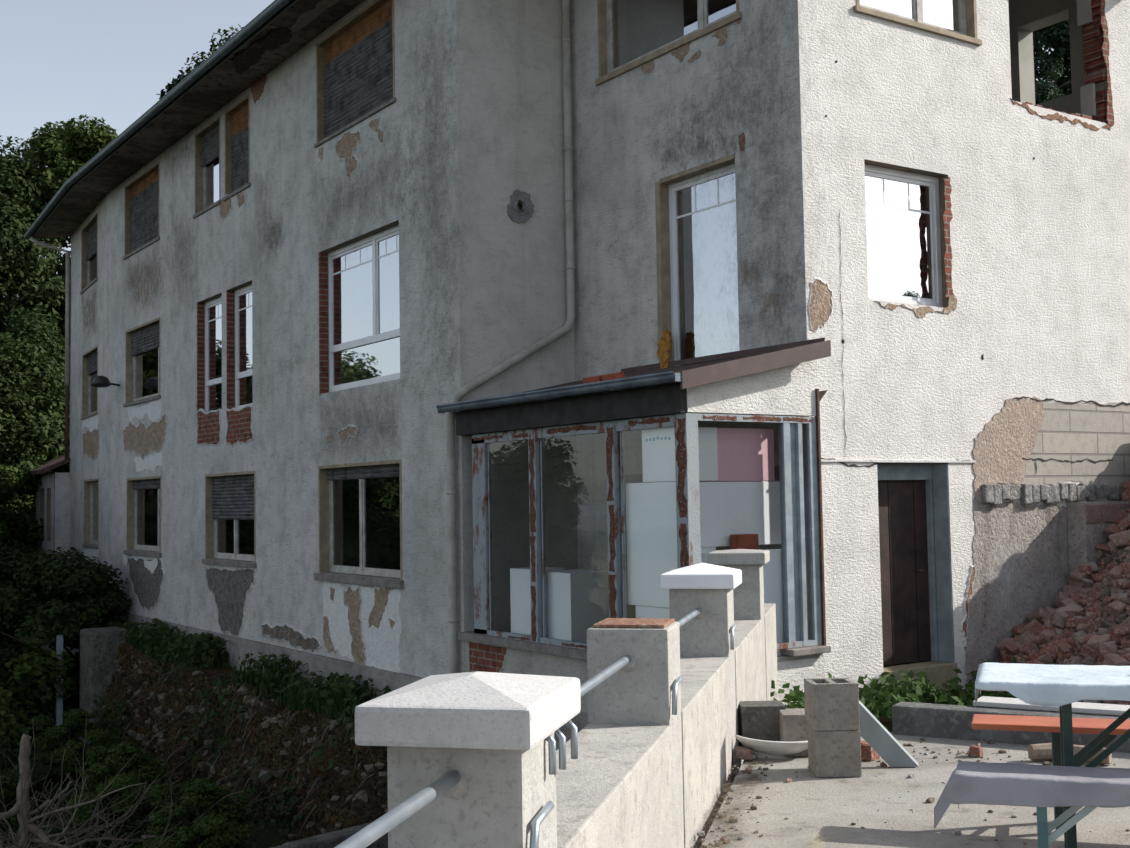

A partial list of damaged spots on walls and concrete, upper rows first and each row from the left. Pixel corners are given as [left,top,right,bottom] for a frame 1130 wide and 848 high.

flaking render [1010,0,1114,131]
flaking render [807,277,833,333]
crack [821,213,879,467]
flaking render [123,555,165,612]
flaking render [205,565,256,638]
flaking render [330,584,395,666]
flaking render [468,634,511,673]
rust [474,432,537,642]
rust [547,425,617,618]
rust [628,417,689,568]
spalling [960,396,1130,682]
spalling [1077,700,1130,715]